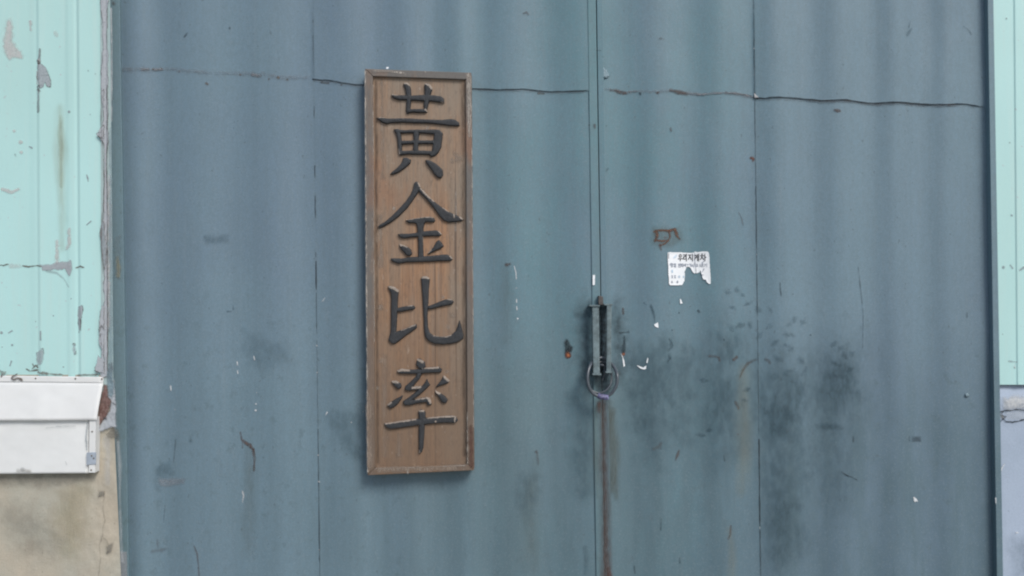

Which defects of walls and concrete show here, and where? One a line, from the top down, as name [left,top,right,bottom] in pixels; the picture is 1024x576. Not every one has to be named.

peeling [4,21,22,59]
peeling [37,50,51,102]
peeling [78,0,116,431]
corrosion [654,228,680,246]
peeling [26,321,63,376]